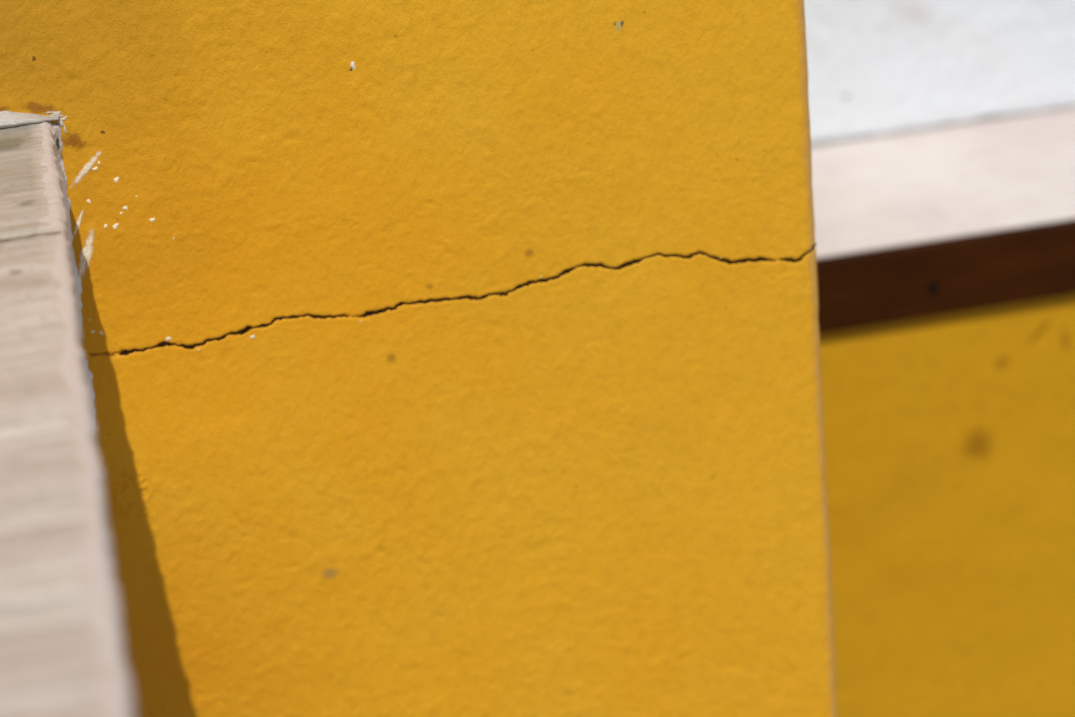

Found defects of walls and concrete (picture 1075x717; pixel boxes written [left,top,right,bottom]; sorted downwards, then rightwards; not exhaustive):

crack [0,231,61,241]
crack [90,243,817,356]